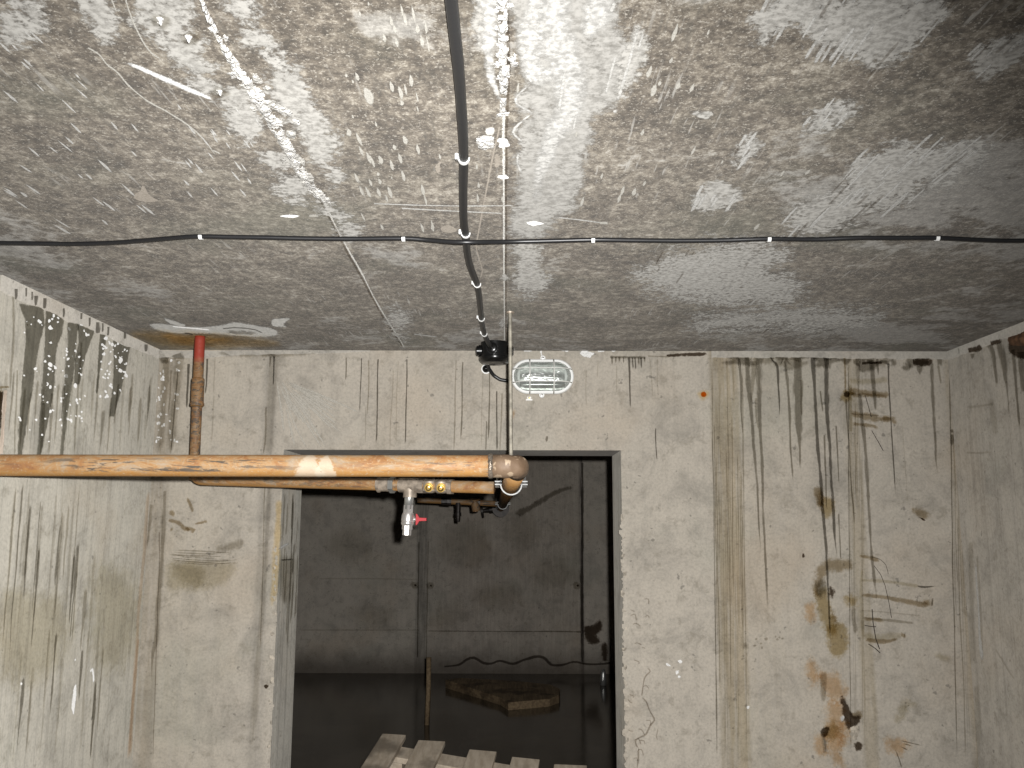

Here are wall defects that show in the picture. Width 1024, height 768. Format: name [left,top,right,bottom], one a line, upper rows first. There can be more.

damp [199,0,404,347]
damp [470,0,630,340]
damp [18,314,89,442]
damp [99,336,128,398]
damp [913,358,933,366]